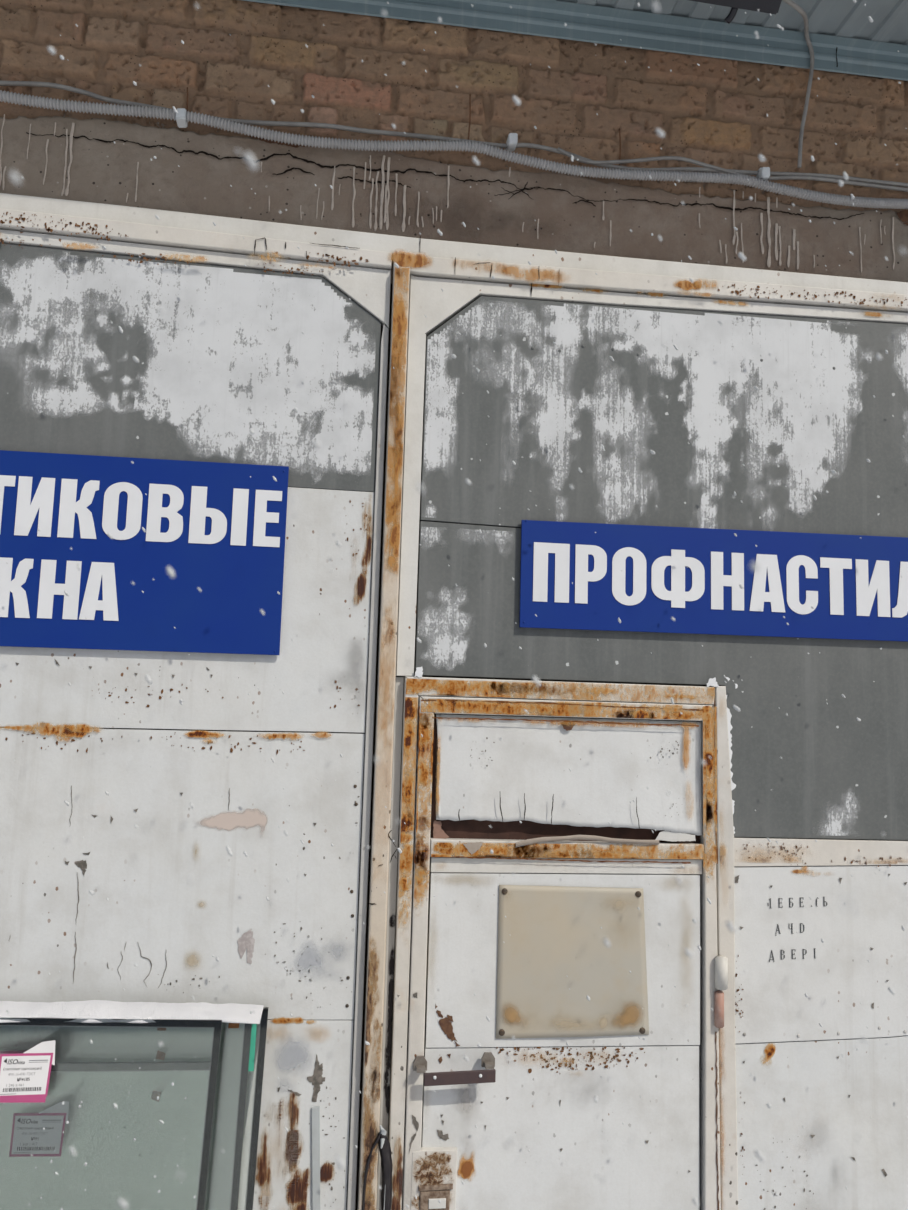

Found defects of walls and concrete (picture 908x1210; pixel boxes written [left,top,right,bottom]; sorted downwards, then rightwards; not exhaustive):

leakage [43,122,75,196]
leakage [300,155,450,232]
leakage [719,190,815,269]
leakage [859,217,895,272]
peeling [0,252,375,479]
corrosion [385,251,430,572]
peeling [424,303,872,529]
peeling [414,591,471,678]
corrosion [0,723,122,752]
peeling [706,677,738,834]
corrosion [398,678,808,924]
corrosion [496,1046,645,1074]